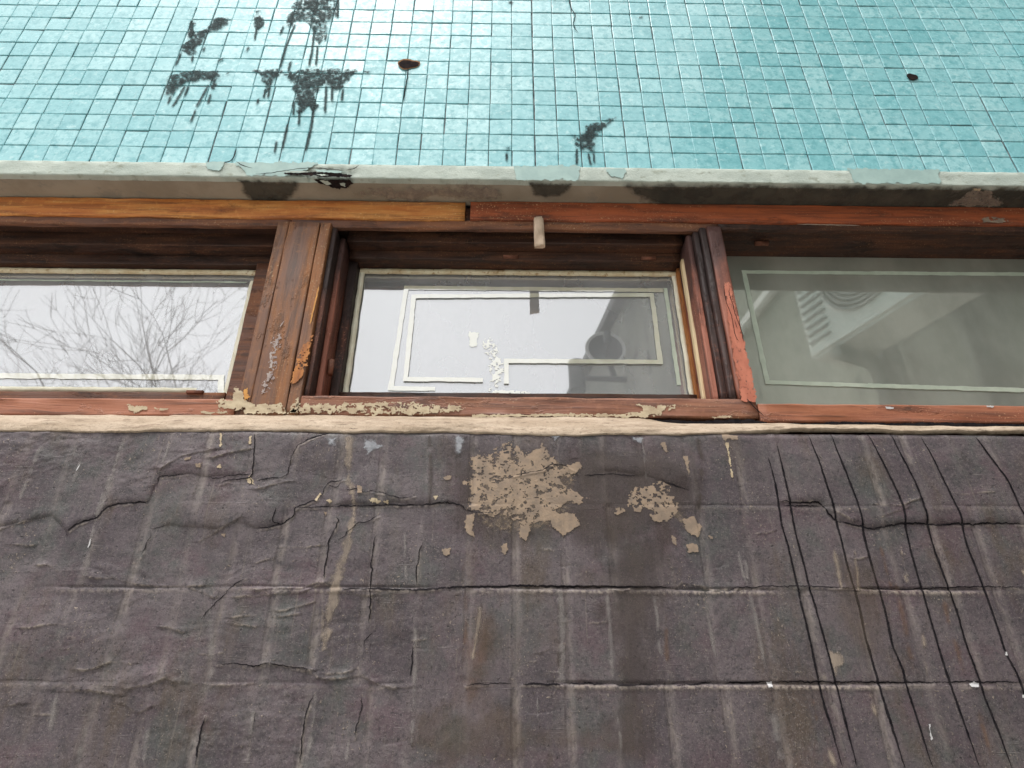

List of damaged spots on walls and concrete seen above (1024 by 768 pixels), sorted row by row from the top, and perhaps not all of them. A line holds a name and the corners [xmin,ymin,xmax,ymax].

leakage [274,86,344,152]
leakage [241,180,297,201]
peeling [206,161,357,189]
leakage [529,183,571,197]
leakage [627,184,1024,208]
peeling [201,321,675,418]
crack [210,428,358,484]
crack [66,474,180,535]
peeling [443,442,587,541]
peeling [614,481,713,553]
crack [257,480,666,642]
crack [654,399,1024,767]